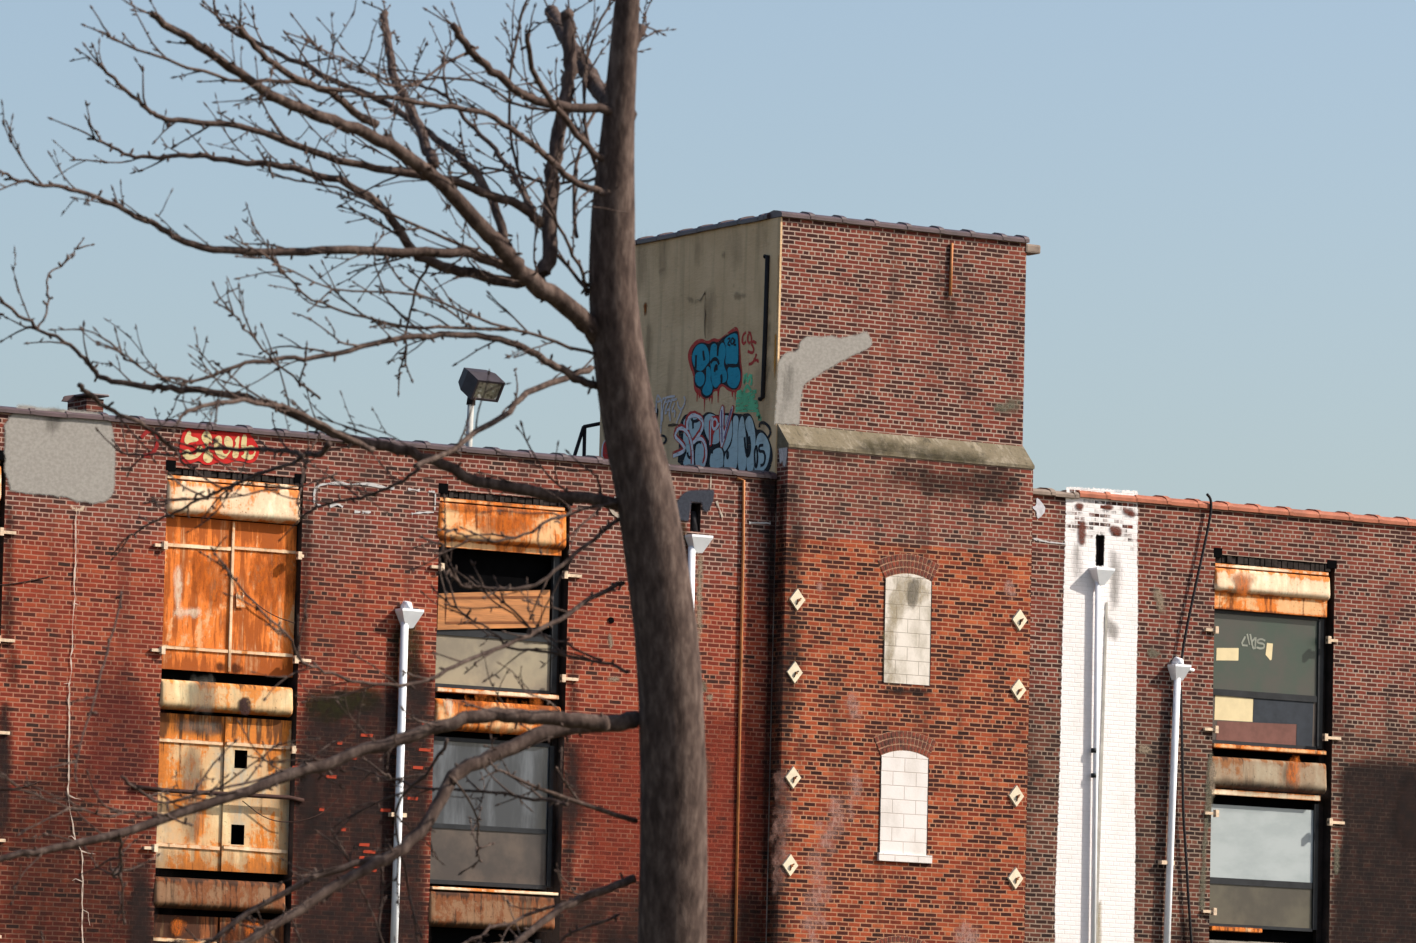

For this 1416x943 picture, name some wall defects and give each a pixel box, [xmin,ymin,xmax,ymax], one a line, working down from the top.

peeling [1076,503,1086,544]
peeling [1104,505,1135,535]
rust [175,554,227,616]
rust [250,553,297,613]
rust [1235,574,1250,594]
rust [239,697,251,715]
rust [1286,758,1310,791]
rust [172,919,182,935]
rust [225,922,259,943]